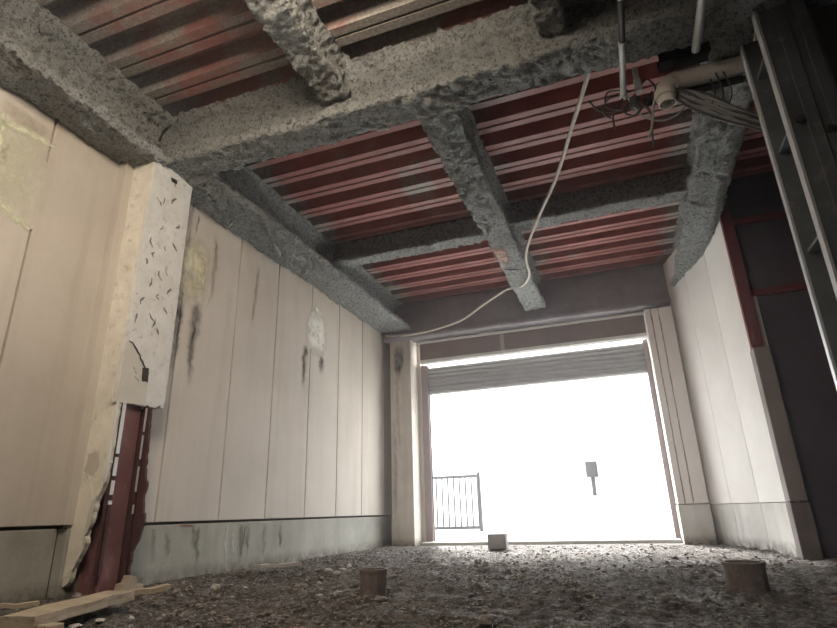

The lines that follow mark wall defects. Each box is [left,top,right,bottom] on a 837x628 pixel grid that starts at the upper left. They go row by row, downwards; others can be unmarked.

peeling [63,451,100,579]